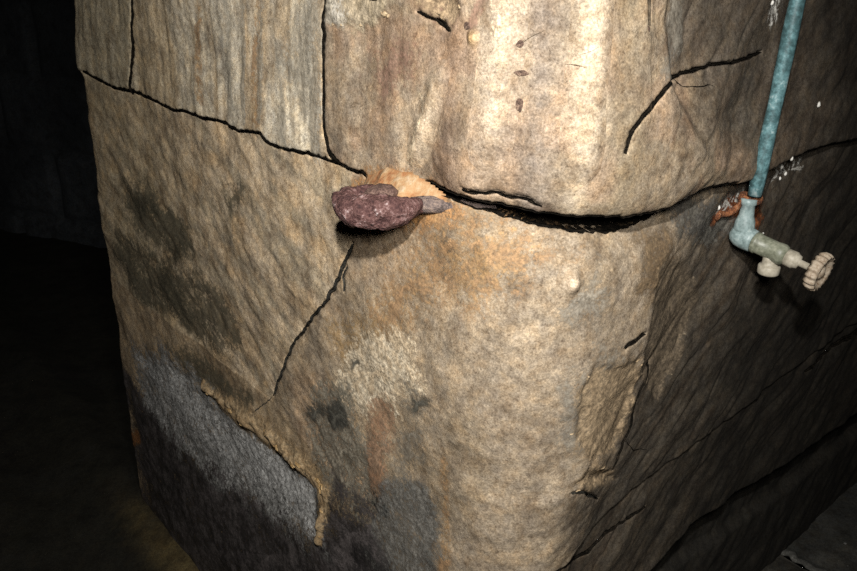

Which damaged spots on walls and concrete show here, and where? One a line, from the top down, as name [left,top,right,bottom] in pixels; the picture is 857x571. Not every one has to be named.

crack [417,11,451,31]
crack [646,0,654,54]
crack [82,0,367,178]
crack [624,51,761,154]
crack [426,181,735,234]
corrosion [754,206,764,228]
corrosion [328,180,542,368]
crack [252,244,353,413]
peeling [200,377,330,546]